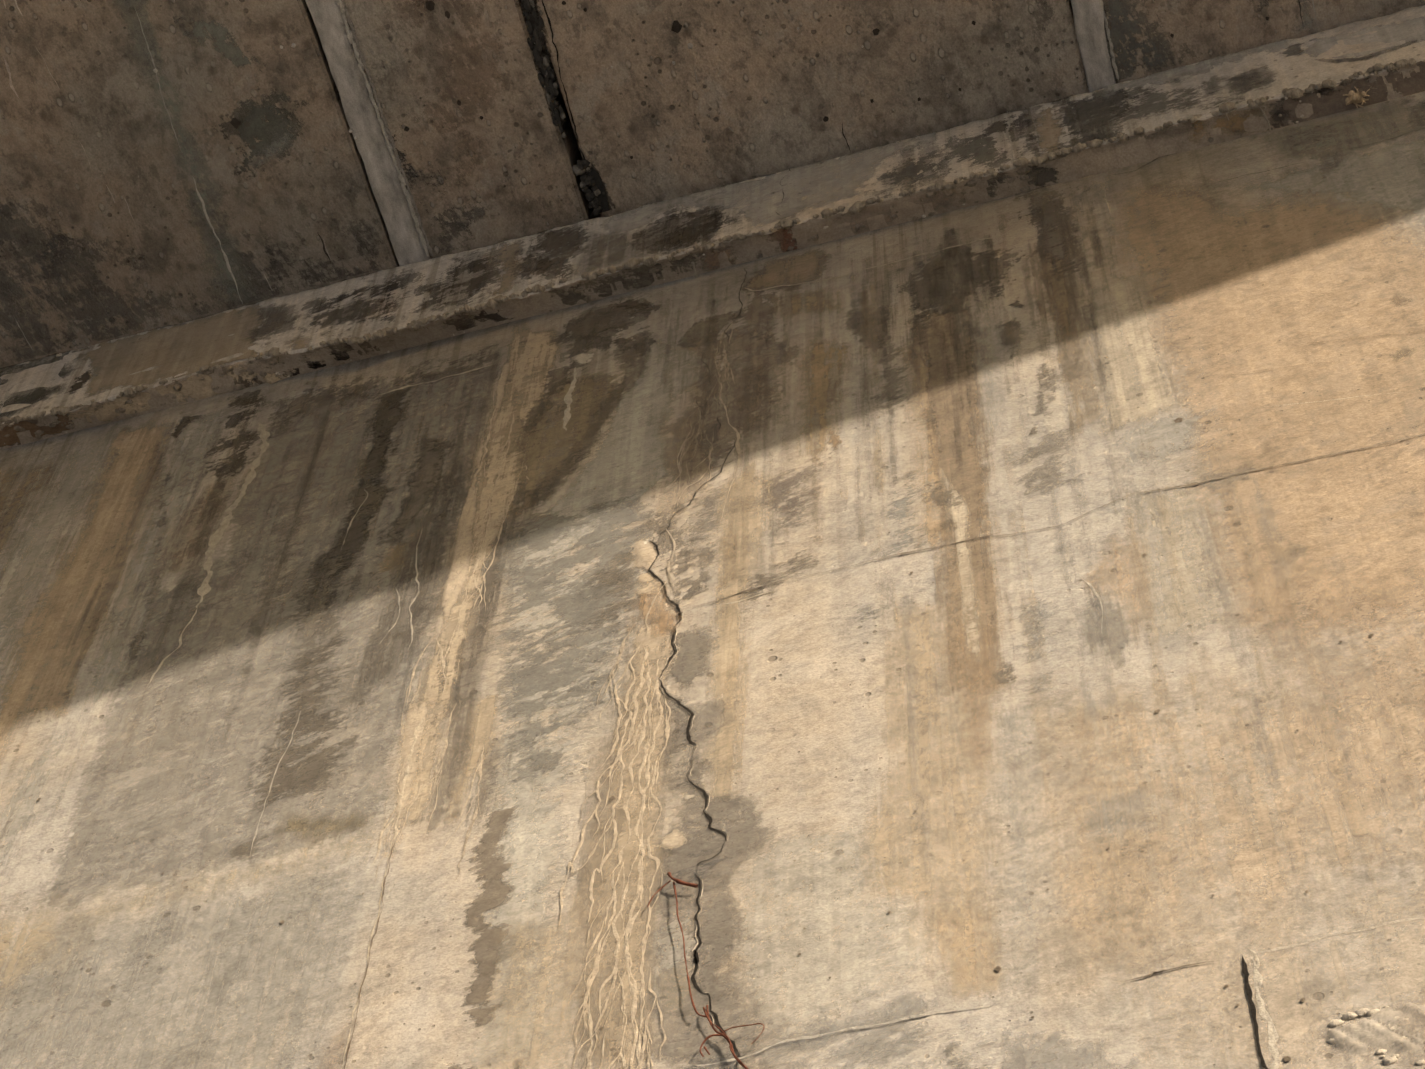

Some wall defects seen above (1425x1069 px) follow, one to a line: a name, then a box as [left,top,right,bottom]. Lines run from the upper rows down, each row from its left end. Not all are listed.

water stain [0,0,927,1069]
crack [645,235,747,1069]
water stain [847,0,1425,688]
crack [1242,956,1268,1069]